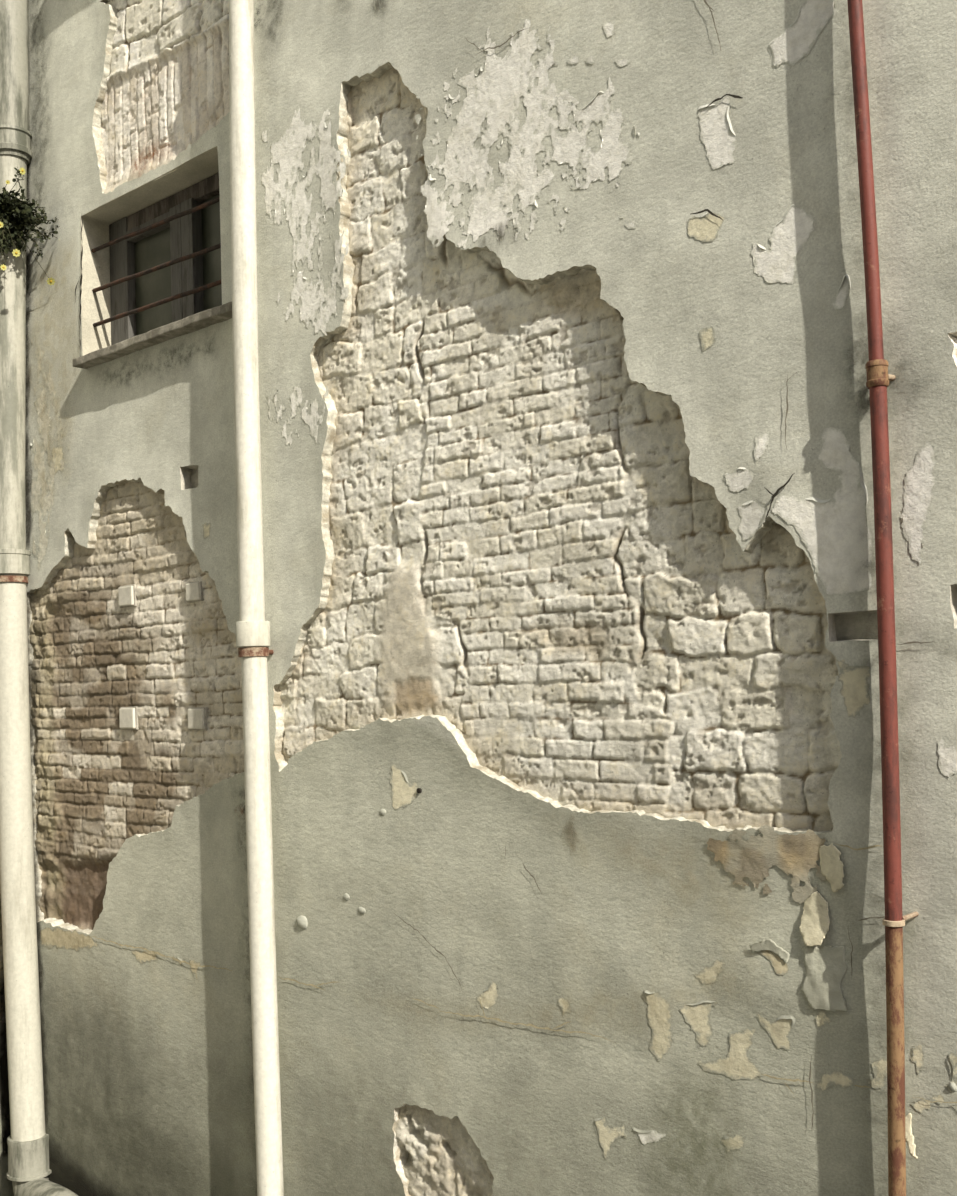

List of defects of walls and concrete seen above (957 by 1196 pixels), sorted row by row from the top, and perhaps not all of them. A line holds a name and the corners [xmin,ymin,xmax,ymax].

spalling [92,0,230,206]
spalling [947,332,957,366]
spalling [261,19,873,1027]
spalling [27,320,244,951]
crack [394,913,612,1042]
peeling [643,990,717,1061]
peeling [697,1014,796,1080]
spalling [392,1104,494,1196]